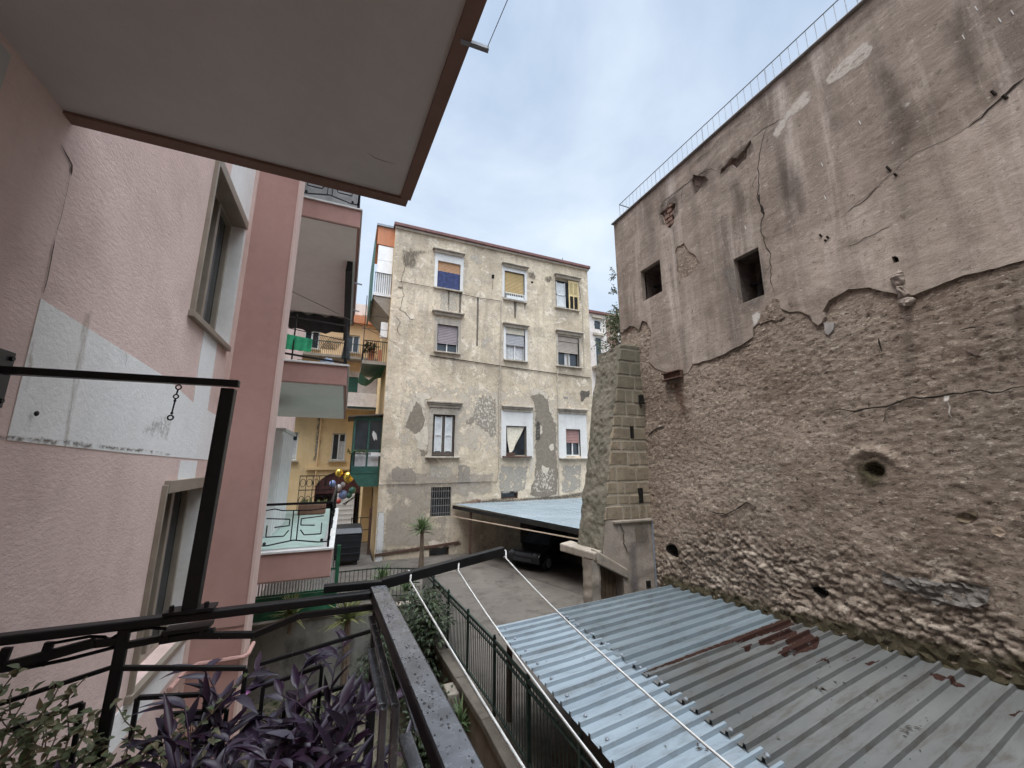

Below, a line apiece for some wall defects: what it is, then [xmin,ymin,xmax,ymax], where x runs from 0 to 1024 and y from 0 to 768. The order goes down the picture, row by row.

flaking render [723,151,747,172]
crack [846,78,1024,213]
flaking render [662,203,675,228]
crack [751,118,780,296]
flaking render [676,244,699,280]
crack [831,386,1024,422]
flaking render [399,380,590,500]
flaking render [881,571,990,609]
corrosion [643,619,829,673]
corrosion [930,673,965,687]